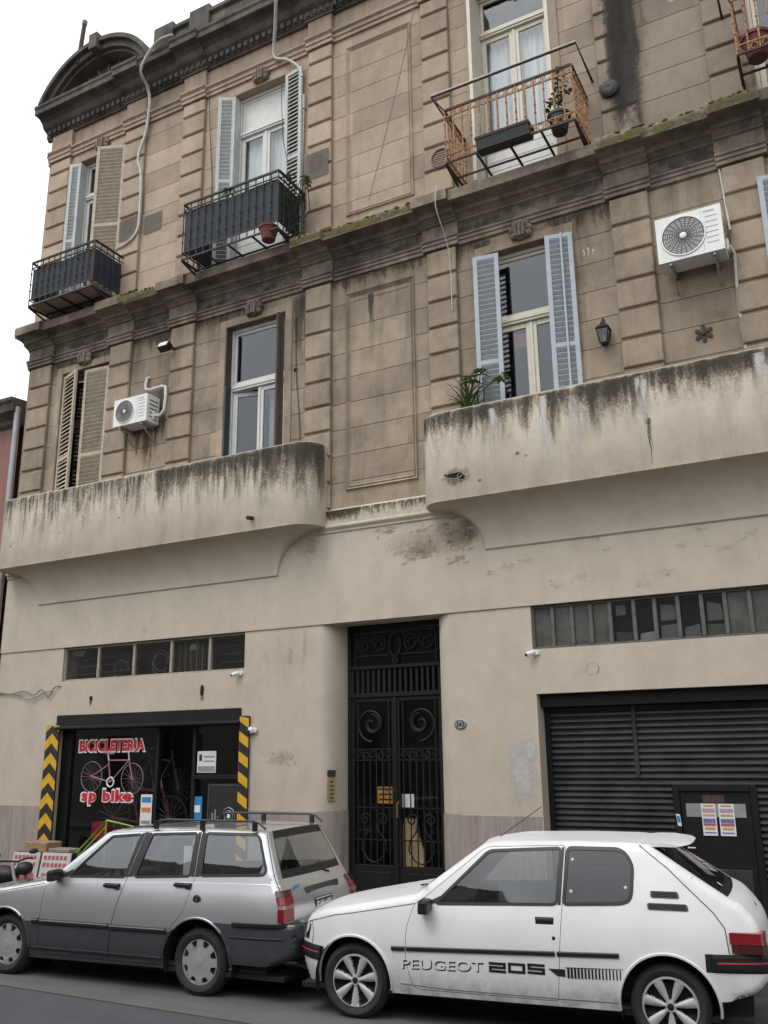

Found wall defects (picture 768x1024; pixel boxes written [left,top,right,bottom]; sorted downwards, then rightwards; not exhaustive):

water stain [424,348,768,453]
water stain [25,477,141,510]
water stain [155,441,325,495]
peeling [373,516,479,565]